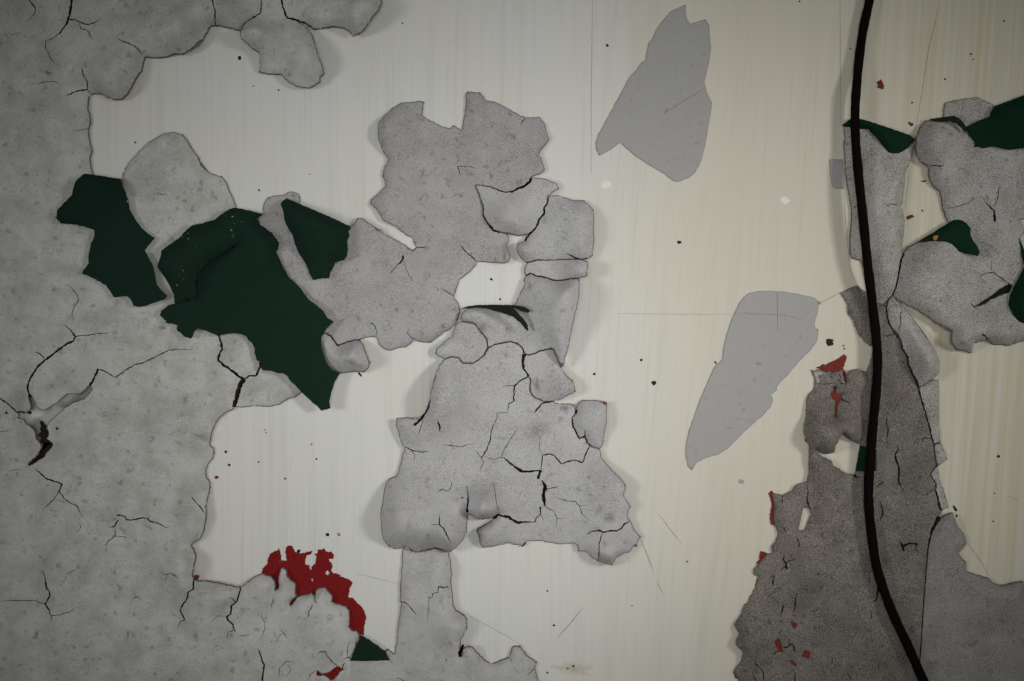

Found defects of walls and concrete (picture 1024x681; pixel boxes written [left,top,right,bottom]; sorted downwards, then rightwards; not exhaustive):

crack [38,0,99,95]
crack [457,165,587,281]
crack [0,284,107,532]
crack [89,349,192,386]
crack [217,335,261,407]
peeling [0,0,641,681]
crack [405,327,628,560]
peeling [734,120,1024,681]
crack [854,253,942,661]
crack [106,514,170,553]
crack [160,571,195,627]
crack [210,589,351,681]